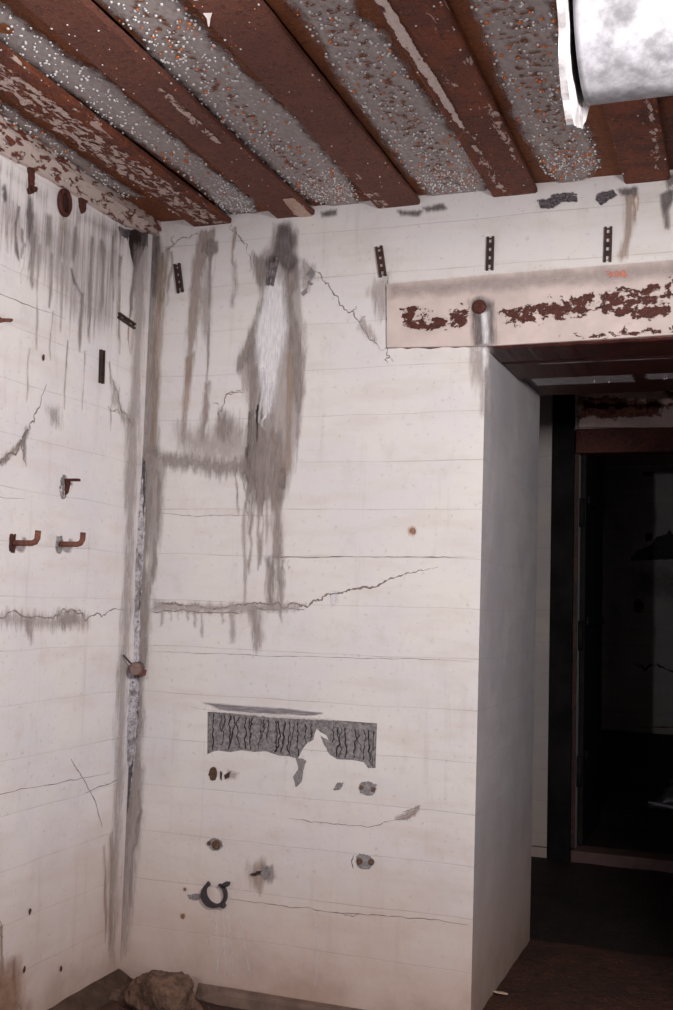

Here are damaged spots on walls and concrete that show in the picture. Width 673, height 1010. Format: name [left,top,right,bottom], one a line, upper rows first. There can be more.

rust [305,0,462,186]
damp [3,187,76,286]
rust [57,188,72,217]
damp [661,174,673,227]
damp [67,236,122,349]
rust [399,303,470,331]
rust [499,275,673,340]
crack [0,384,57,465]
damp [104,225,303,944]
crack [0,556,455,661]
flaking render [207,712,377,787]
crack [0,759,117,825]